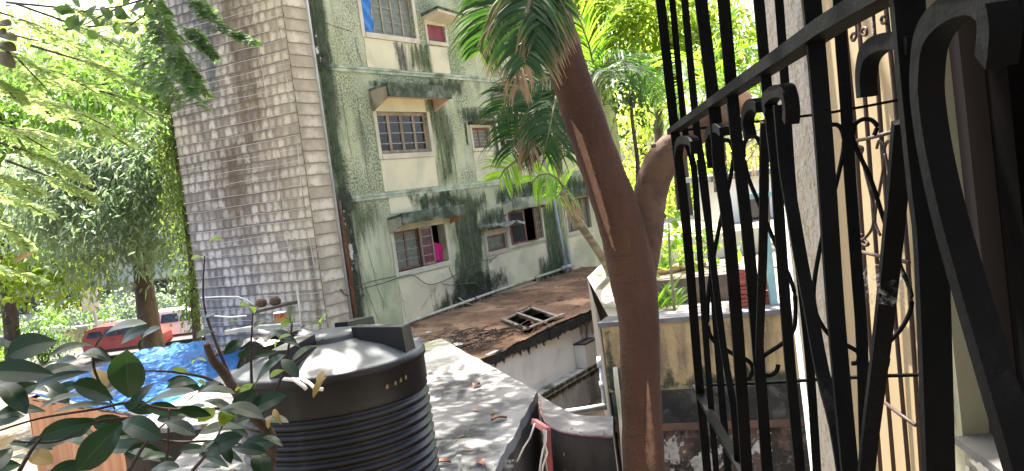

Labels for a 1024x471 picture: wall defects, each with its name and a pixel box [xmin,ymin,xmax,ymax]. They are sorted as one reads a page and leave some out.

damp [396,43,463,94]
damp [310,0,365,318]
damp [432,100,453,178]
damp [421,180,545,312]
peeling [664,432,723,471]